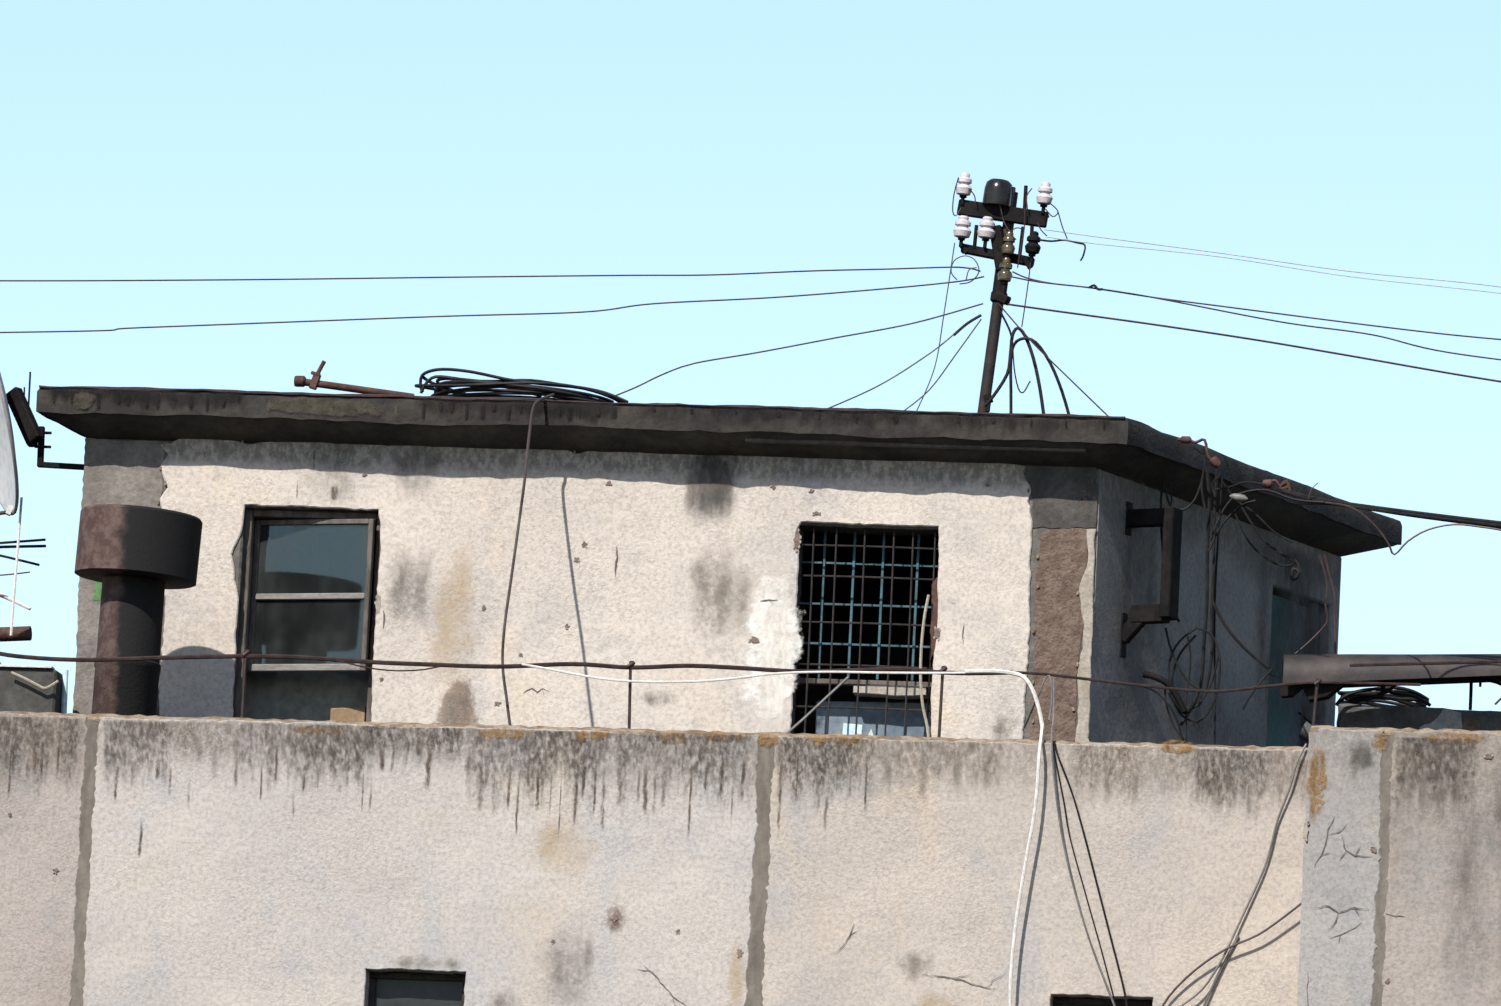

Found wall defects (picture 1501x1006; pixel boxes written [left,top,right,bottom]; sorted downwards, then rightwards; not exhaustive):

damp [692,455,731,510]
damp [0,717,78,791]
damp [105,720,192,797]
damp [238,680,872,834]
damp [1188,745,1282,800]
damp [1397,736,1474,789]